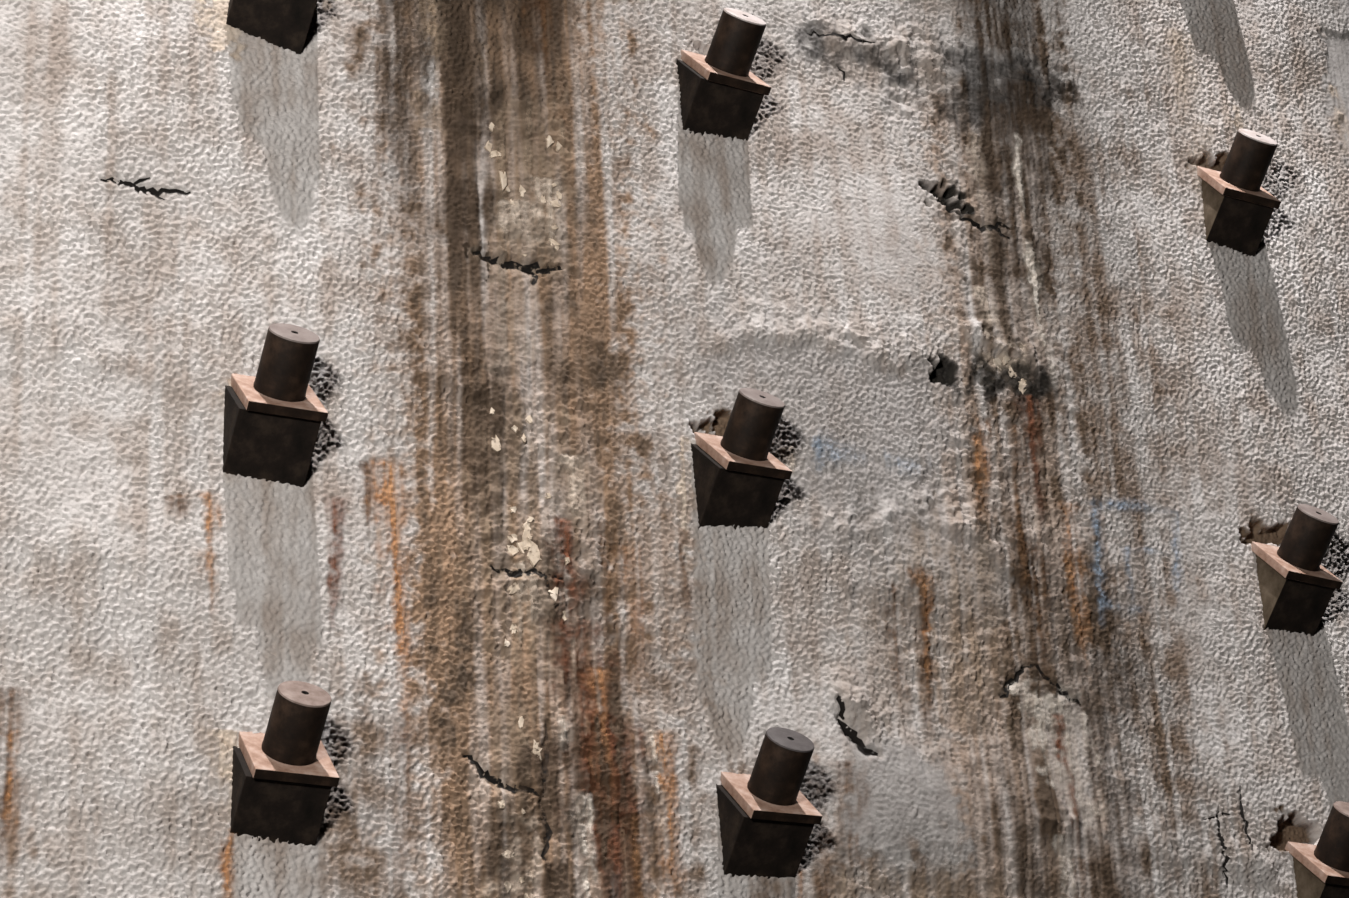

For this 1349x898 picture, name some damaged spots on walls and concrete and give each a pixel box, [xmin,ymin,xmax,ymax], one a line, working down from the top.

leakage [381,0,490,251]
leakage [946,0,1062,344]
crack [473,251,562,285]
leakage [464,362,503,495]
leakage [967,356,1057,413]
corrosion [363,461,409,654]
corrosion [555,518,574,595]
leakage [517,713,580,823]
leakage [566,682,626,870]
corrosion [579,670,642,896]
leakage [1009,685,1061,747]
leakage [544,862,589,897]